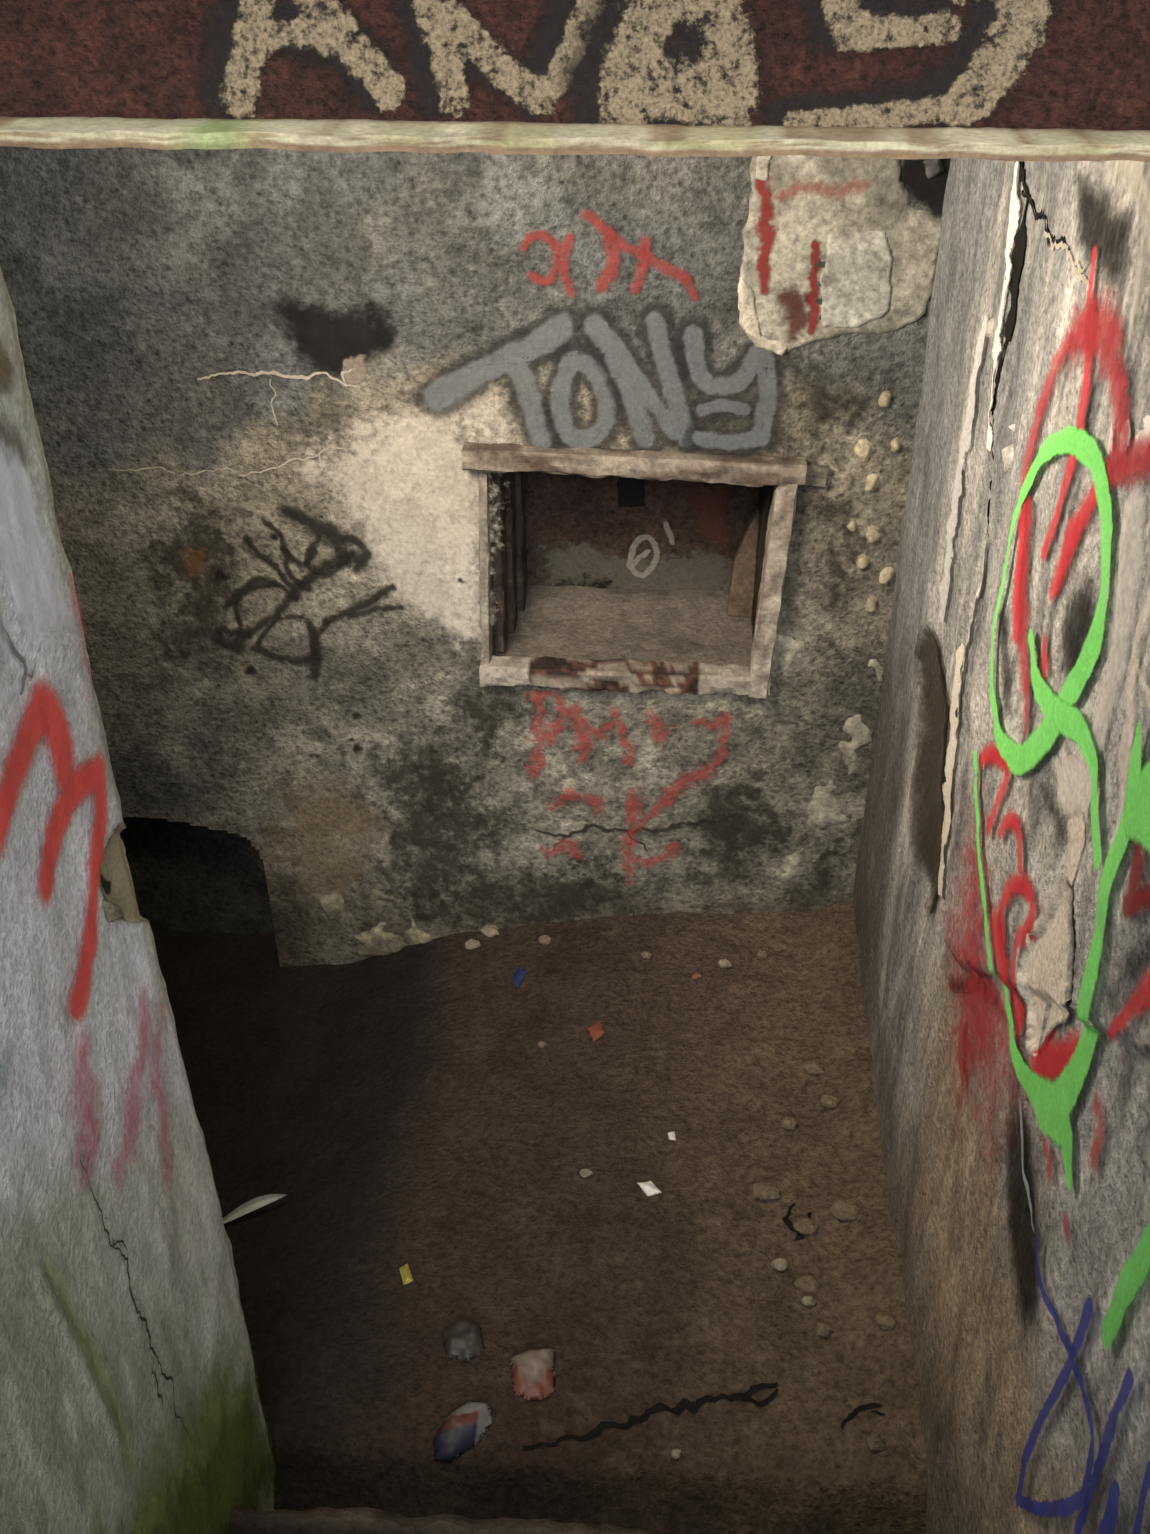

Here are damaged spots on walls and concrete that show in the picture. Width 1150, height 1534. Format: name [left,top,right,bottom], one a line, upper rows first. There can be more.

crack [987,161,1089,536]
crack [535,814,745,851]
spalling [1016,746,1099,1056]
crack [80,1159,192,1441]
crack [522,1382,778,1451]